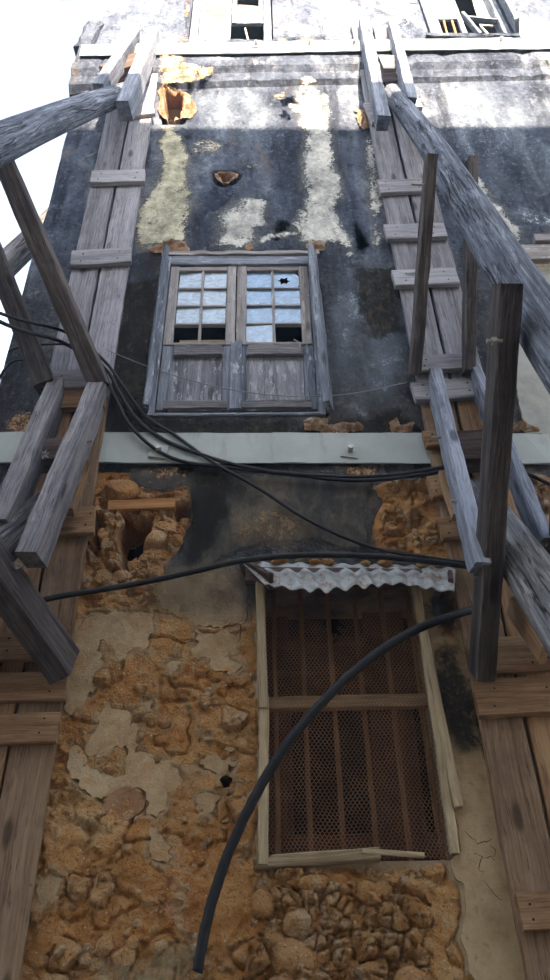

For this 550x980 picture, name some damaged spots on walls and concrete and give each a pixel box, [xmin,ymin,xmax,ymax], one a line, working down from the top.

peeling [136,55,221,253]
peeling [215,76,354,257]
spalling [20,465,526,980]
damp [431,592,458,629]
damp [435,644,485,755]
crack [467,834,503,900]